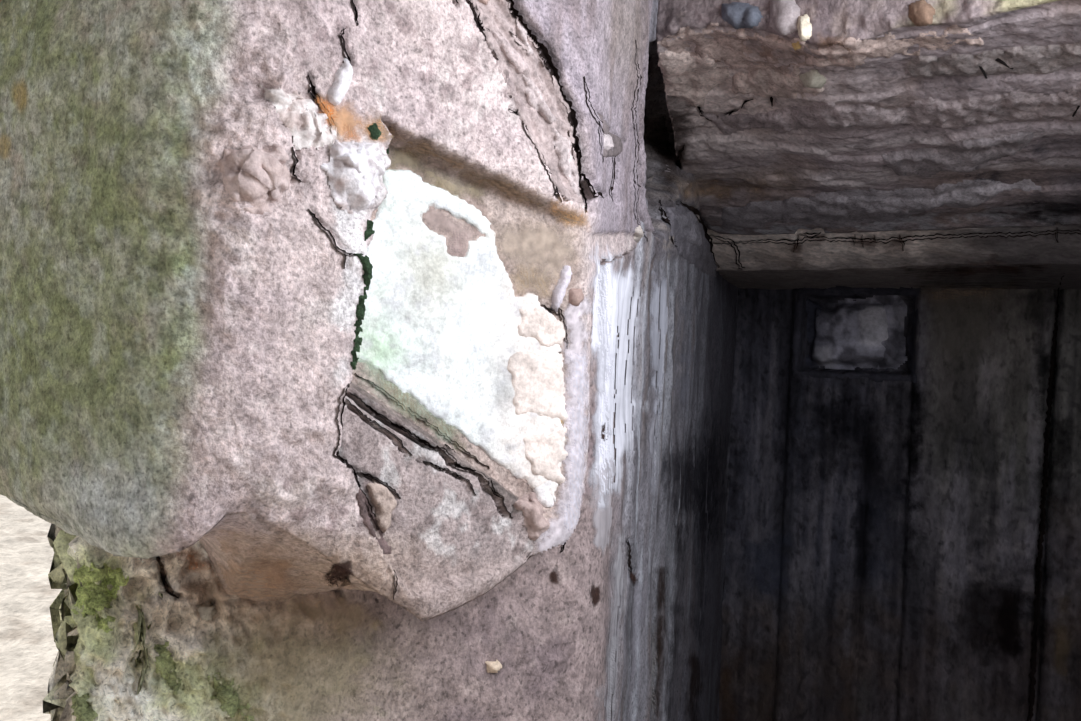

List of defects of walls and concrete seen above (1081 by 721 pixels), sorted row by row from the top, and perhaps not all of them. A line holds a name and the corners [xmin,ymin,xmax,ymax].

corrosion [320,102,585,223]
crack [456,0,1081,269]
crack [334,376,512,530]
flaking render [356,169,668,554]